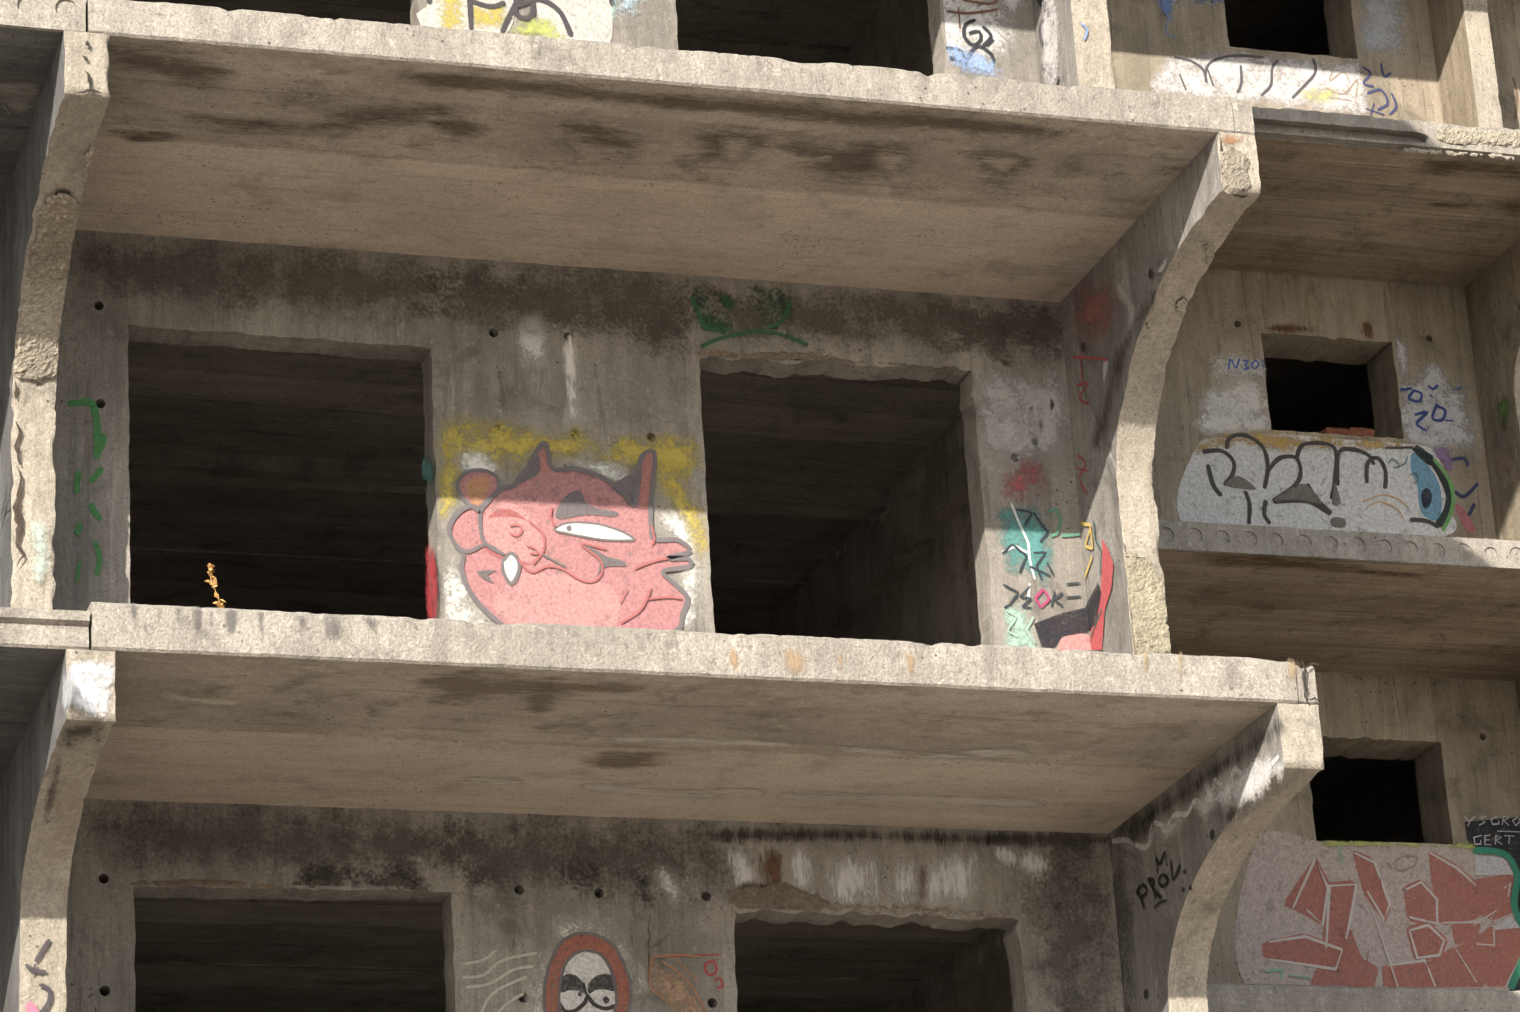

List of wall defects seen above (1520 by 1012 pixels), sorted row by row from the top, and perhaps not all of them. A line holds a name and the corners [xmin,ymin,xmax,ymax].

damp [114,46,229,85]
damp [115,132,166,142]
damp [319,104,479,135]
damp [562,125,664,154]
damp [408,75,1061,137]
spalling [1404,124,1520,160]
damp [783,146,911,178]
spalling [14,146,95,382]
damp [82,244,1062,416]
damp [423,673,633,712]
damp [42,721,1298,1012]